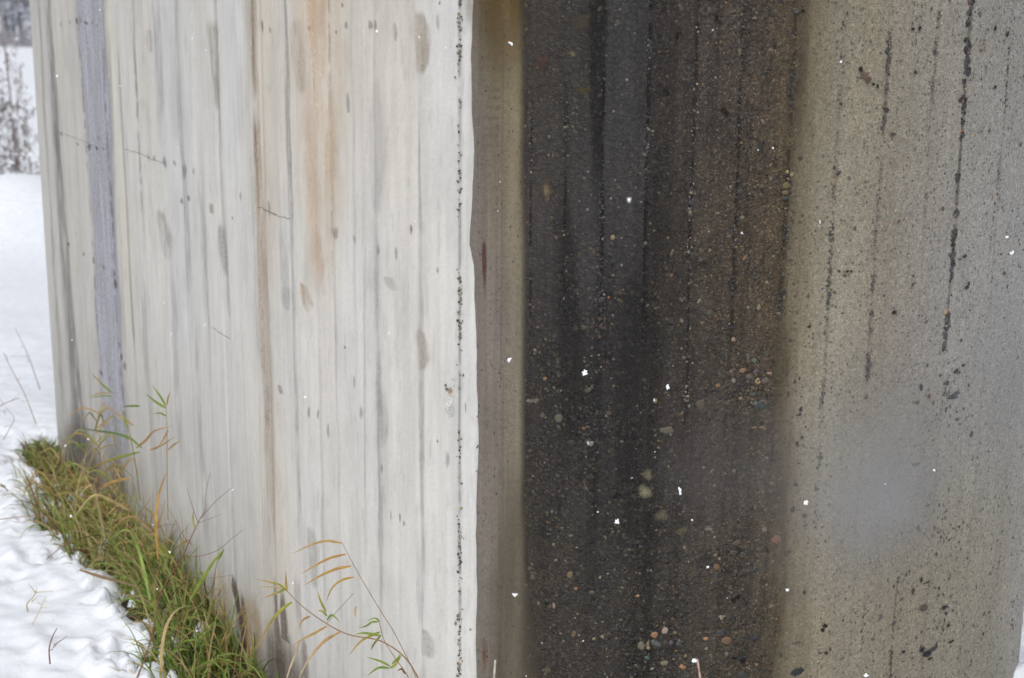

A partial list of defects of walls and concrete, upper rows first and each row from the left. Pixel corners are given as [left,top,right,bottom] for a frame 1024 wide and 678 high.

water stain [470,0,808,678]